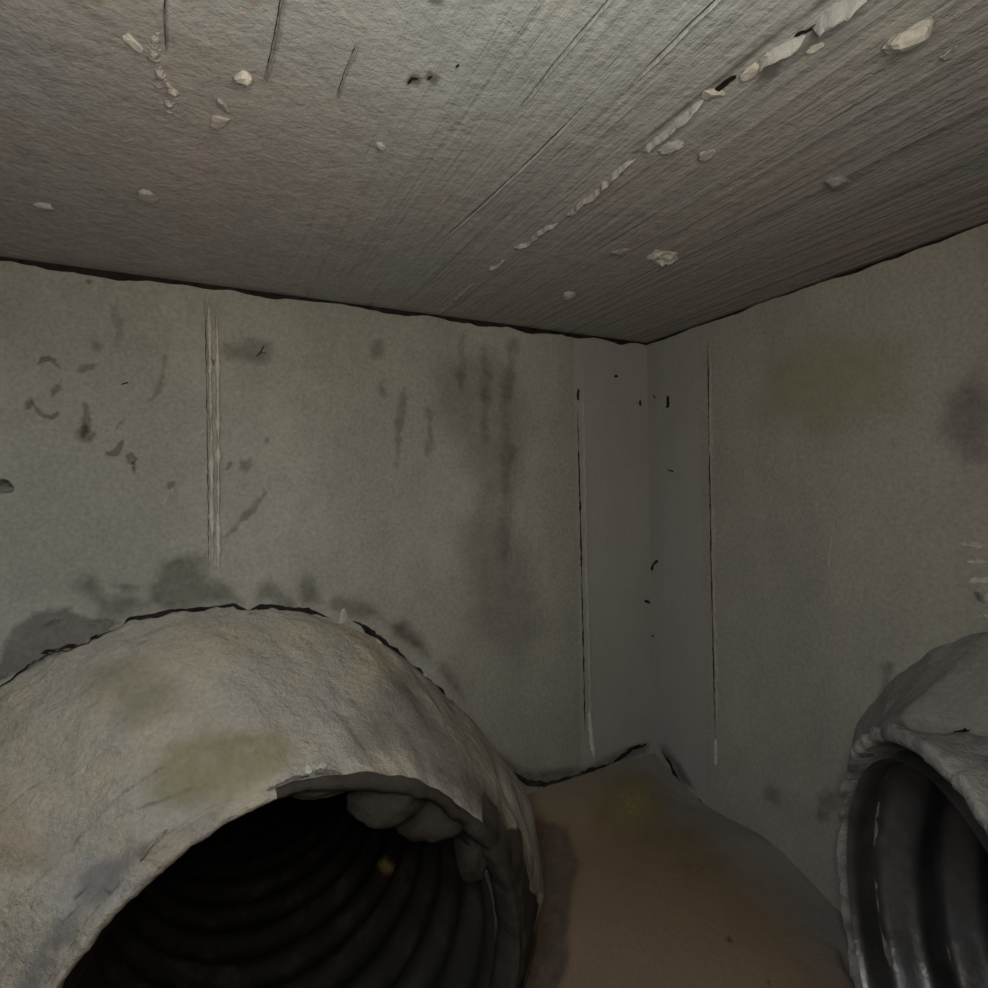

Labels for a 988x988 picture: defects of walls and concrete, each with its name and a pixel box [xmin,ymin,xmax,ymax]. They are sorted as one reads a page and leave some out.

peeling [806,42,825,54]
spalling [881,17,934,54]
peeling [740,52,771,82]